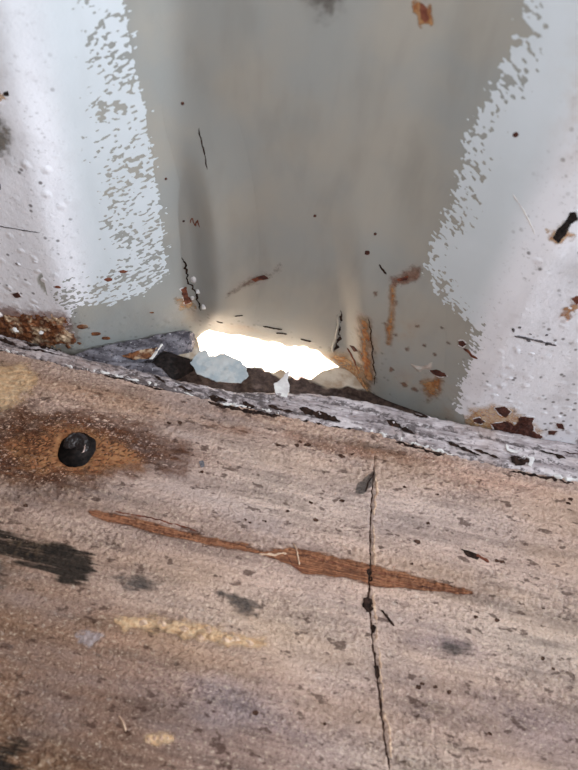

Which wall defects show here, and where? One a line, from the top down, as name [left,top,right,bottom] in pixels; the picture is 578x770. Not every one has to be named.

corrosion [412,1,433,28]
peeling [42,0,171,333]
peeling [422,0,574,419]
corrosion [0,306,110,349]
corrosion [386,269,420,345]
corrosion [333,345,367,390]
corrosion [0,405,186,489]
corrosion [467,406,565,439]
leakage [0,530,97,584]
crack [362,461,394,770]